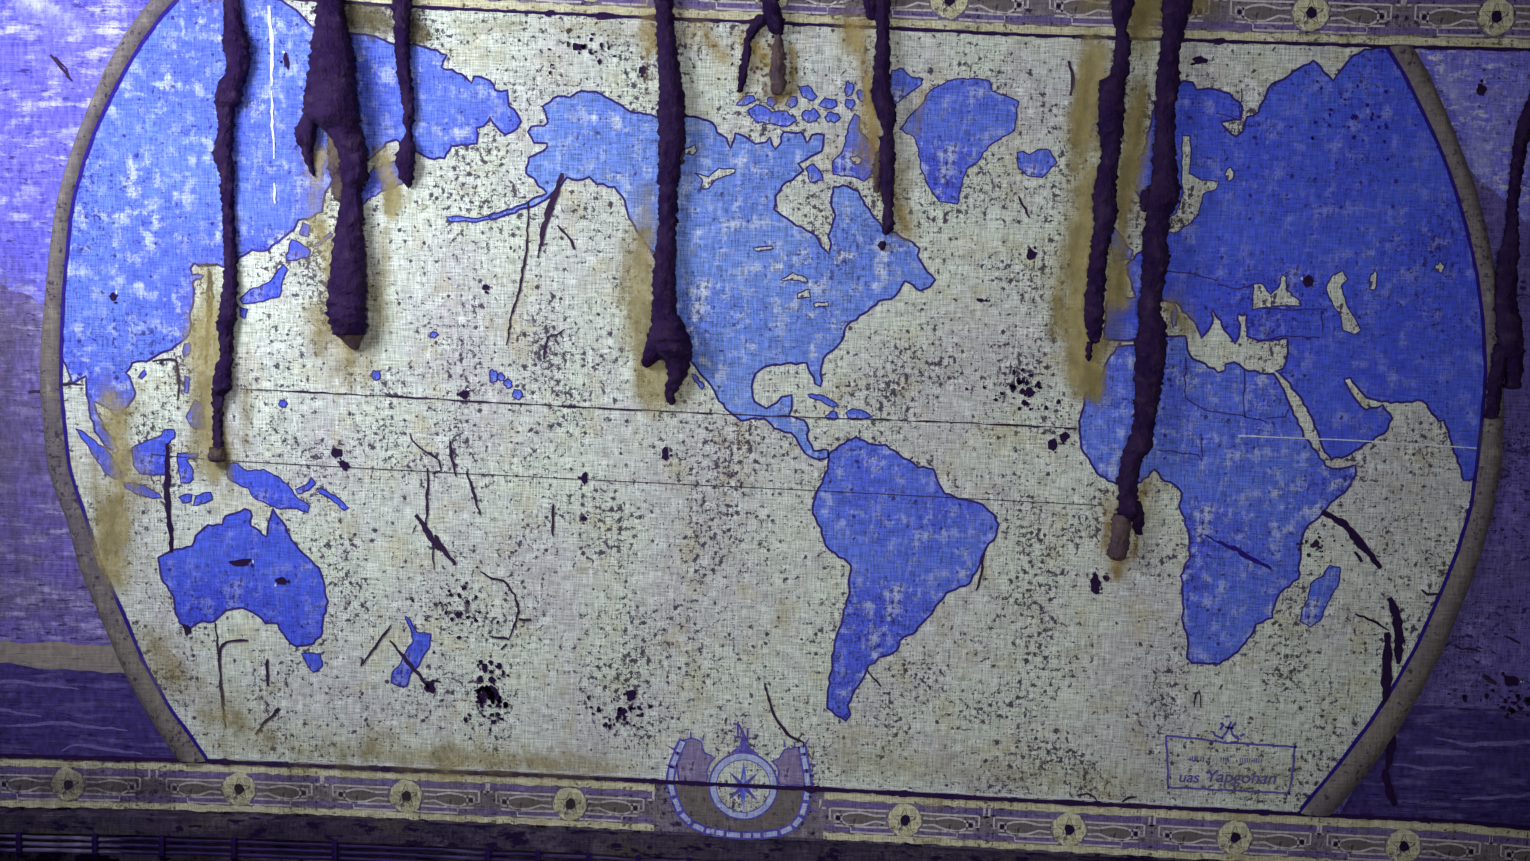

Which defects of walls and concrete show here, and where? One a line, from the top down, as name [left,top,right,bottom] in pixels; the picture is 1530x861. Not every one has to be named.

rust [344,0,656,49]
rust [1182,38,1530,52]
rust [377,149,401,218]
rust [674,0,1161,400]
rust [627,213,667,405]